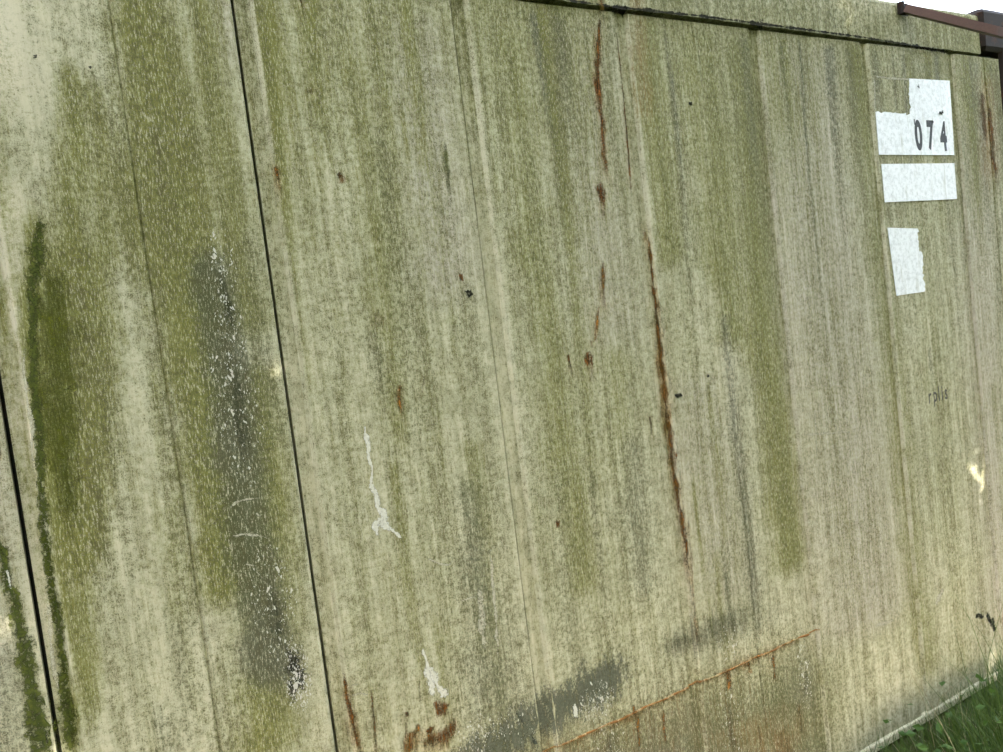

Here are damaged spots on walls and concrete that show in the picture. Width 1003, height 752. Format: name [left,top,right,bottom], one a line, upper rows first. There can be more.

rust [594,0,608,170]
rust [617,39,632,190]
rust [596,183,606,216]
damp [33,267,85,528]
rust [644,232,695,608]
rust [401,701,456,752]
rust [617,640,792,746]